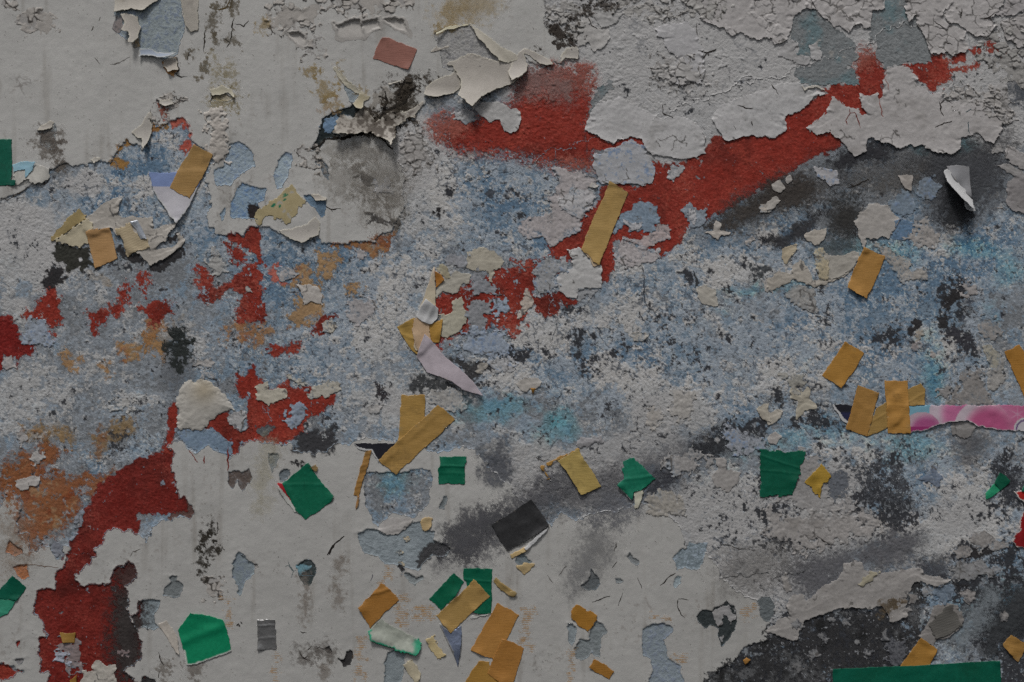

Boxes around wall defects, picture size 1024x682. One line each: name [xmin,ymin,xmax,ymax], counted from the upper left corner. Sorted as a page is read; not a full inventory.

crack [845,79,889,124]
crack [936,99,971,133]
peeling [214,141,256,186]
peeling [273,152,293,189]
peeling [220,183,267,221]
peeling [304,194,327,217]
peeling [255,409,275,437]
peeling [282,402,308,430]
peeling [74,465,195,579]
peeling [126,575,183,630]
peeling [33,581,117,682]
peeling [642,622,684,682]